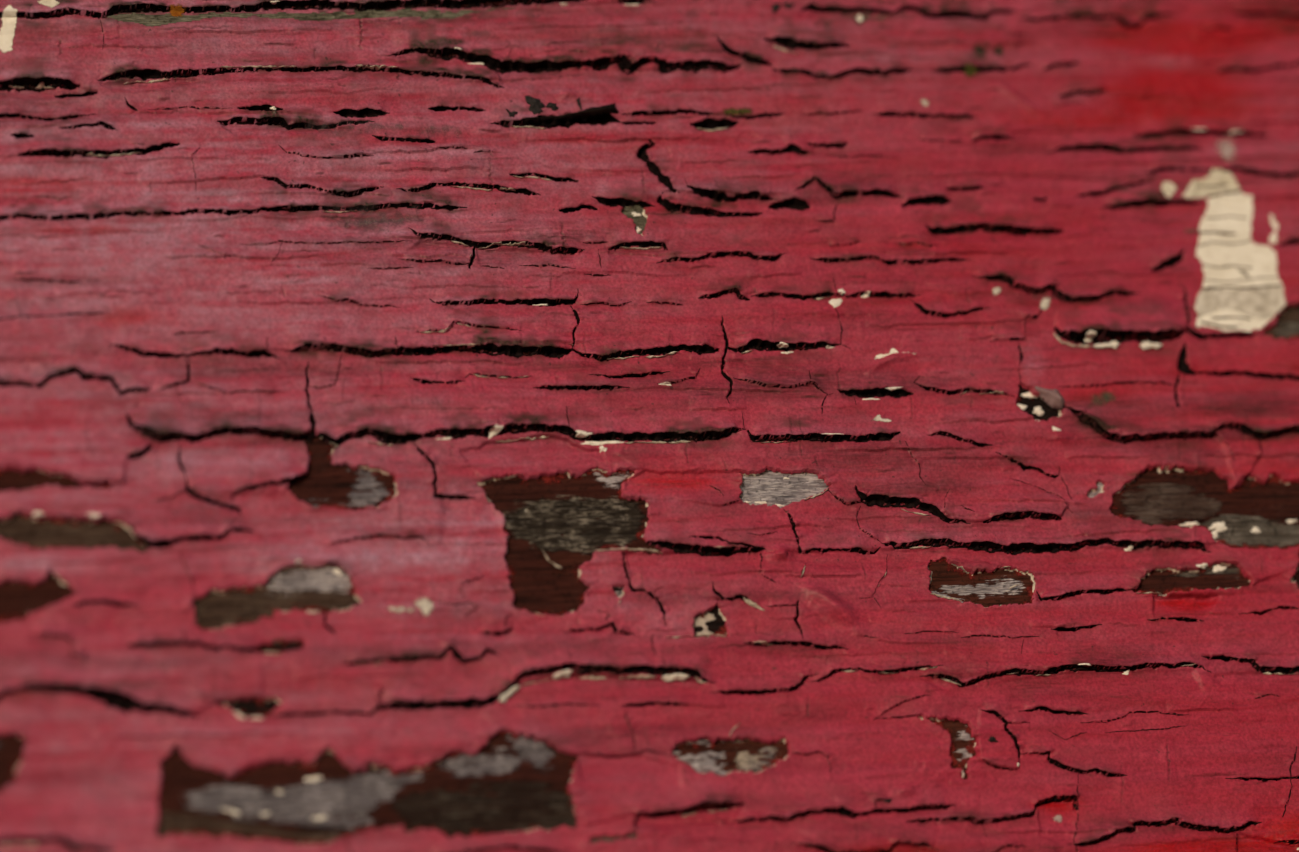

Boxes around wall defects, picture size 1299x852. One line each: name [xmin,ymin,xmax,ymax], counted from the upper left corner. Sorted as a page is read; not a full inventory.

crack [0,0,585,50]
crack [800,3,1299,31]
crack [0,36,1299,665]
crack [0,599,199,718]
peeling [193,560,361,631]
peeling [287,431,398,511]
peeling [477,468,663,616]
crack [266,551,1299,758]
peeling [928,557,1035,608]
peeling [1087,466,1299,589]
peeling [156,729,578,846]
crack [634,706,1299,852]